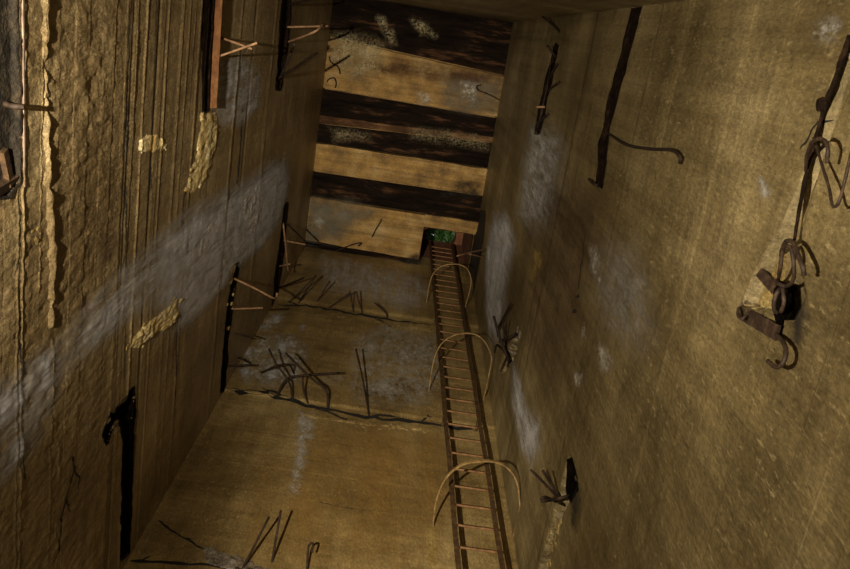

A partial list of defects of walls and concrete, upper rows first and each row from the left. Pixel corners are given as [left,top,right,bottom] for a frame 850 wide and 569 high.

spalling [138,135,167,154]
spalling [184,112,218,193]
water stain [523,133,558,222]
peeling [126,297,183,350]
crack [278,302,430,327]
spalling [492,303,521,376]
spalling [740,254,796,327]
crack [226,388,473,430]
spalling [530,457,579,507]